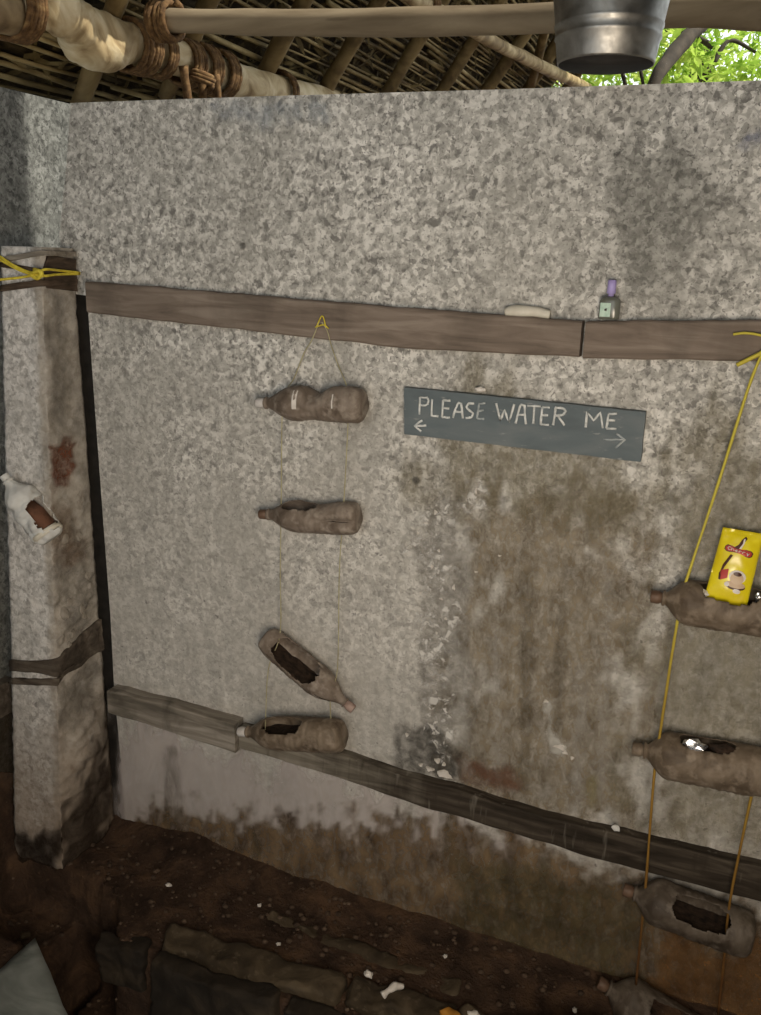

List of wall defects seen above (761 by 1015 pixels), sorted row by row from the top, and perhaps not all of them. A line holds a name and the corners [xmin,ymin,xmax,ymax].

rust [48,440,76,486]
peeling [462,479,487,511]
peeling [405,504,462,748]
leakage [397,440,659,825]
leakage [15,718,112,869]
leakage [135,808,761,1015]